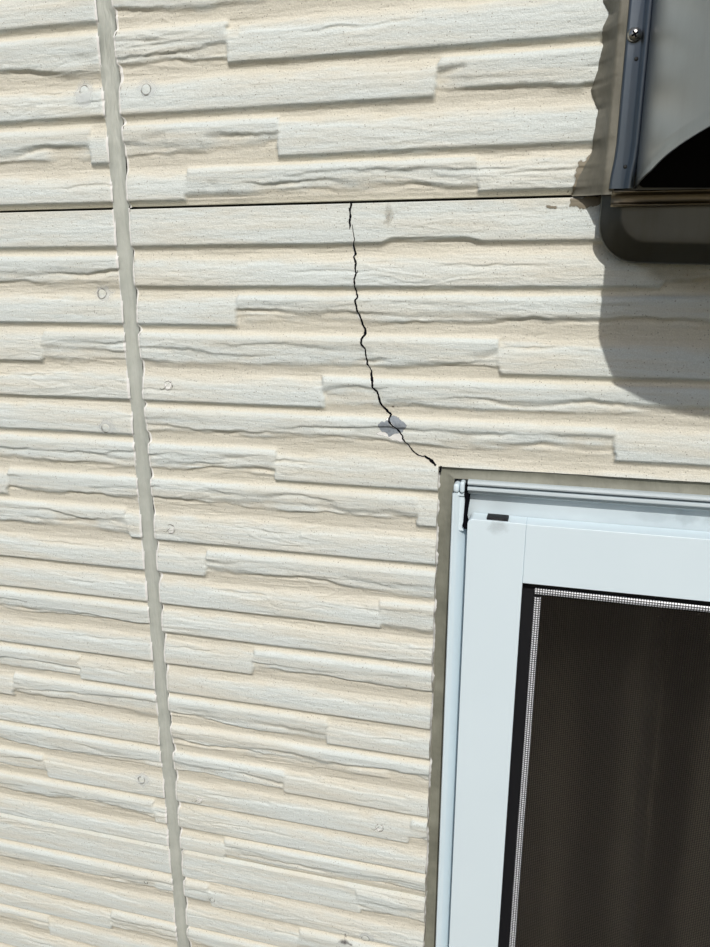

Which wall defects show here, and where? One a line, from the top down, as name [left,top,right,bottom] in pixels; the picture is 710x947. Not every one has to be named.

crack [349,202,442,472]